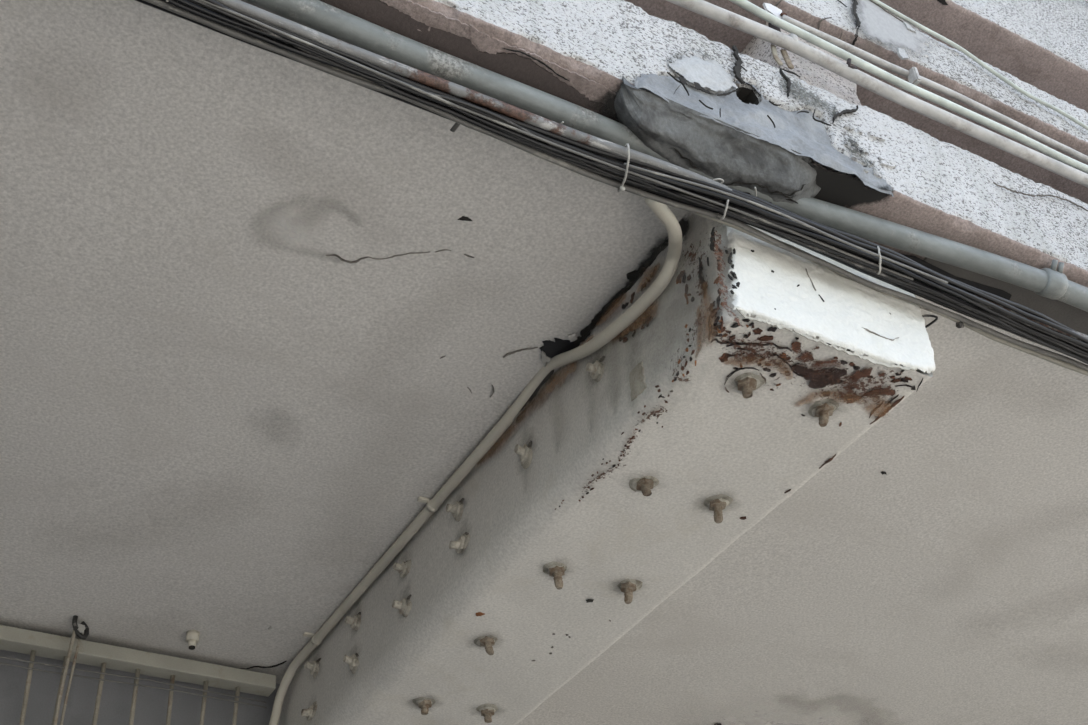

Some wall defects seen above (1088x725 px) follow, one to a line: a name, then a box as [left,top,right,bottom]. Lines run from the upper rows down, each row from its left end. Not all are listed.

peeling [856,0,930,60]
spalling [320,0,896,204]
crack [326,249,474,264]
corrosion [579,226,742,502]
corrosion [786,342,913,424]